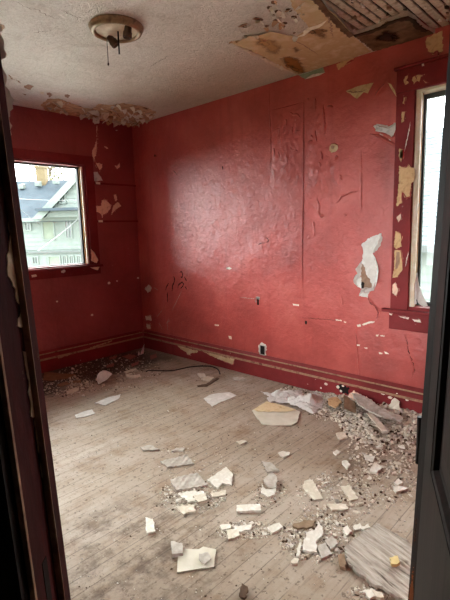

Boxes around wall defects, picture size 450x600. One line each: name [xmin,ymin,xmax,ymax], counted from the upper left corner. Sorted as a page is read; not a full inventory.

leakage [284,47,304,73]
peeling [229,0,450,76]
peeling [41,92,156,182]
peeling [96,194,121,218]
peeling [396,149,415,206]
peeling [392,231,403,297]
peeling [178,346,234,365]